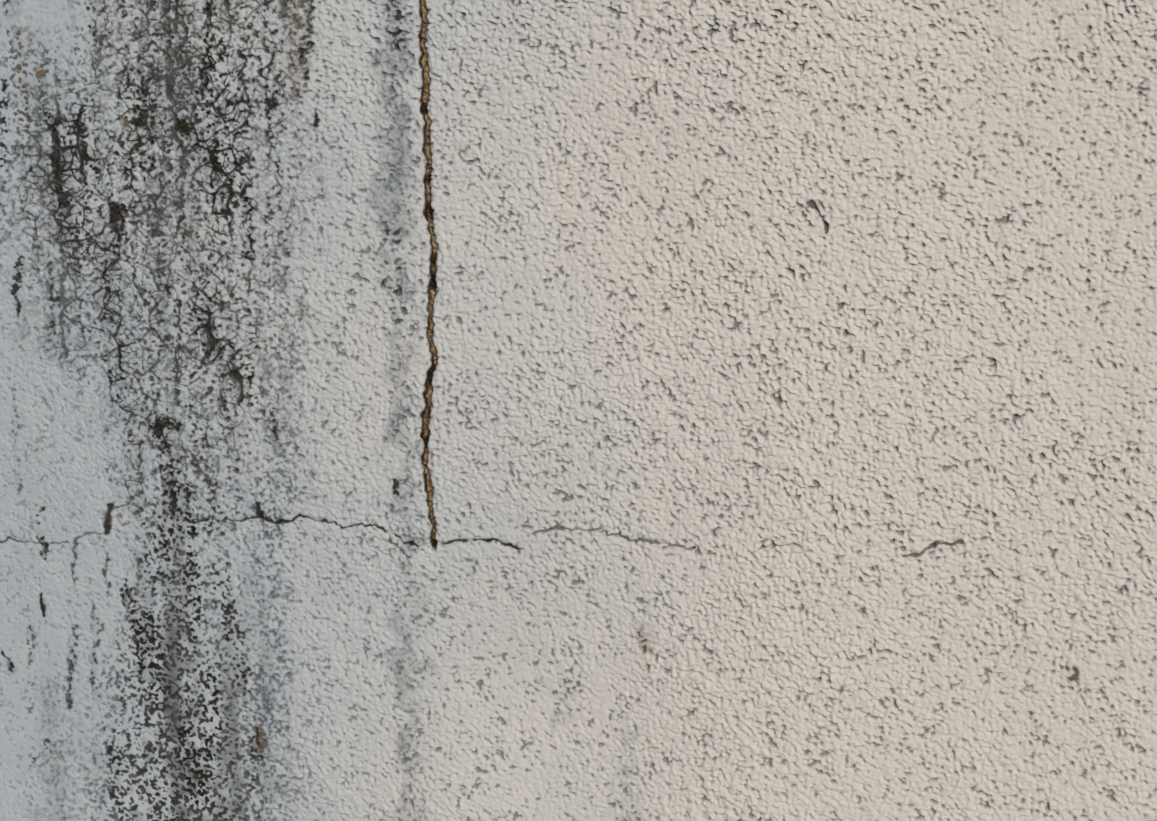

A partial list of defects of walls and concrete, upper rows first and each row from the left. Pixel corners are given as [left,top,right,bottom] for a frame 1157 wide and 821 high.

leakage [0,30,26,167]
leakage [11,256,23,316]
leakage [29,0,295,821]
crack [183,0,684,558]